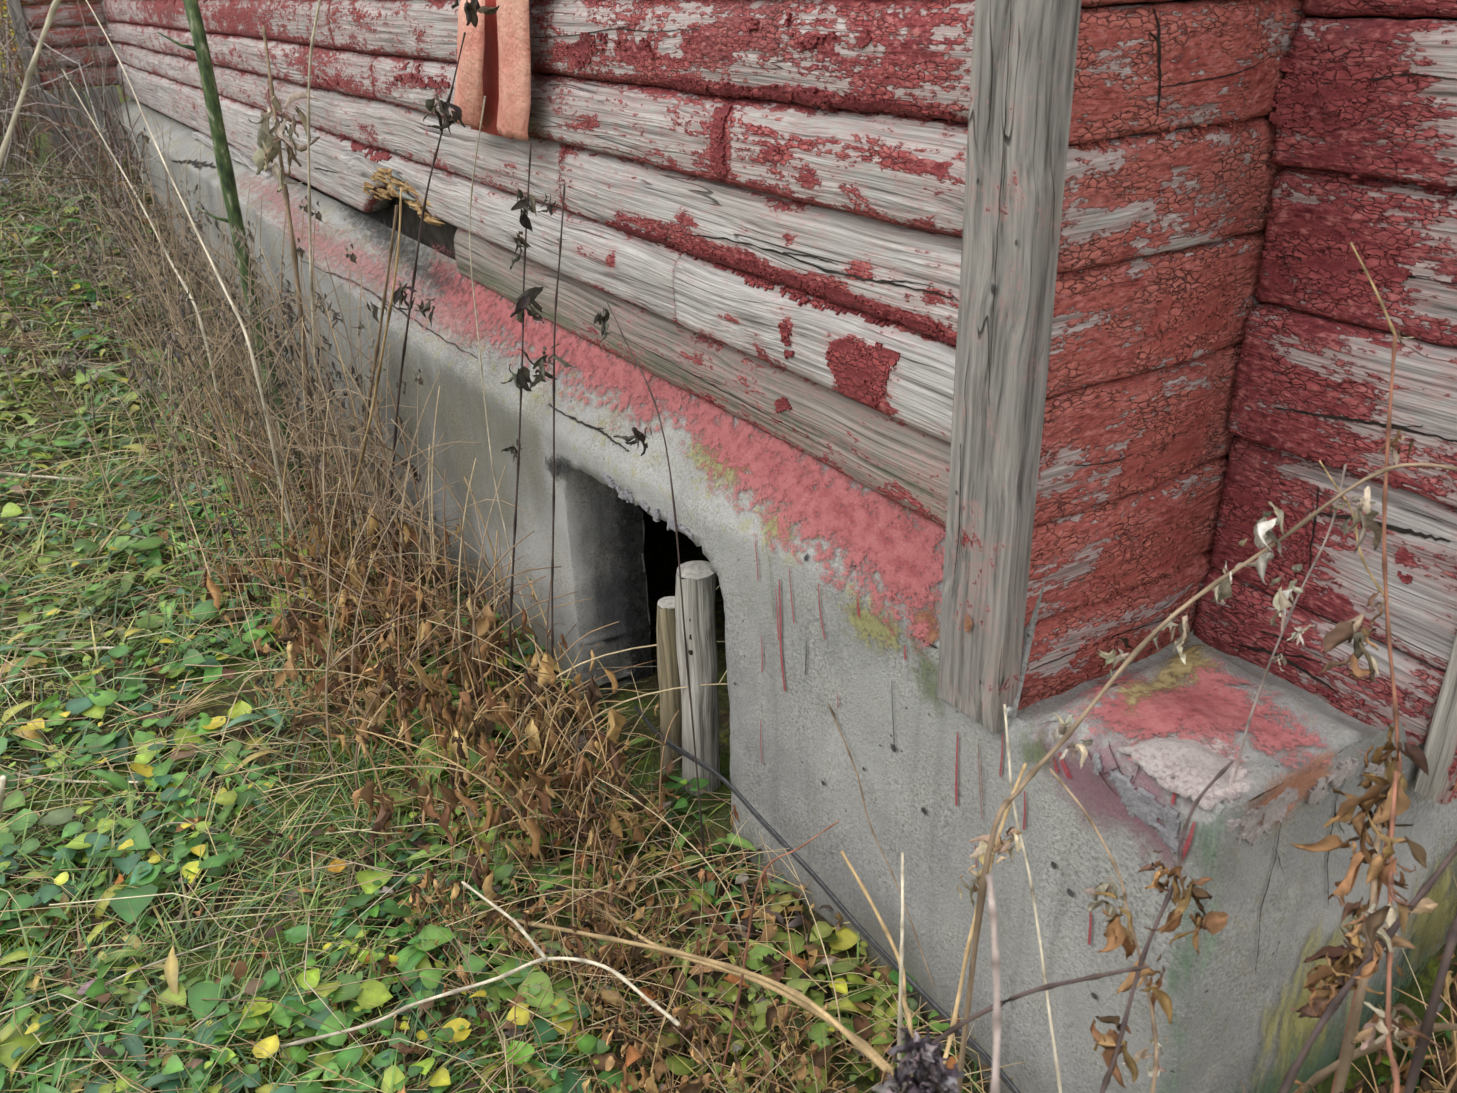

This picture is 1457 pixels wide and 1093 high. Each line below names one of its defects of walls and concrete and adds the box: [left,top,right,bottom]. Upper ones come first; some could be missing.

crack [1149,7,1265,115]
peeling [339,133,392,163]
peeling [669,77,955,176]
crack [989,2,1011,388]
crack [686,234,957,299]
crack [1359,269,1457,284]
peeling [605,220,957,409]
crack [1074,454,1133,466]
spalling [602,473,694,541]
peeling [1220,481,1311,565]
crack [1030,617,1168,671]
peeling [1055,623,1179,695]